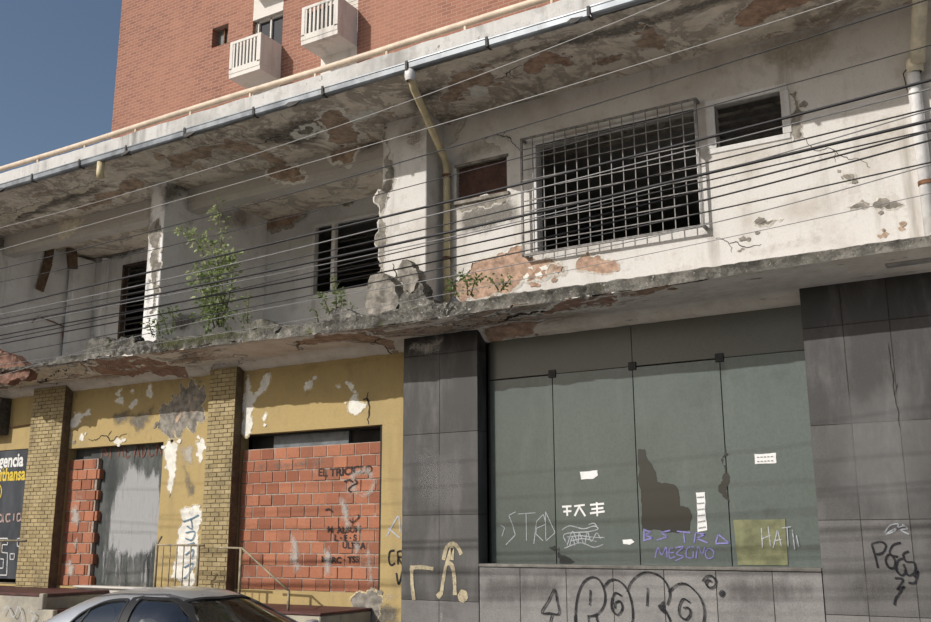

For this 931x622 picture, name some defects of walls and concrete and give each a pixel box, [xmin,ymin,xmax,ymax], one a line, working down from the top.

peeling [733,0,825,28]
peeling [521,50,576,75]
flaking render [789,90,808,141]
peeling [157,137,308,185]
peeling [289,107,397,272]
peeling [148,217,164,314]
flaking render [450,244,621,302]
flaking render [15,354,248,498]
peeling [241,372,272,439]
crack [362,392,370,424]